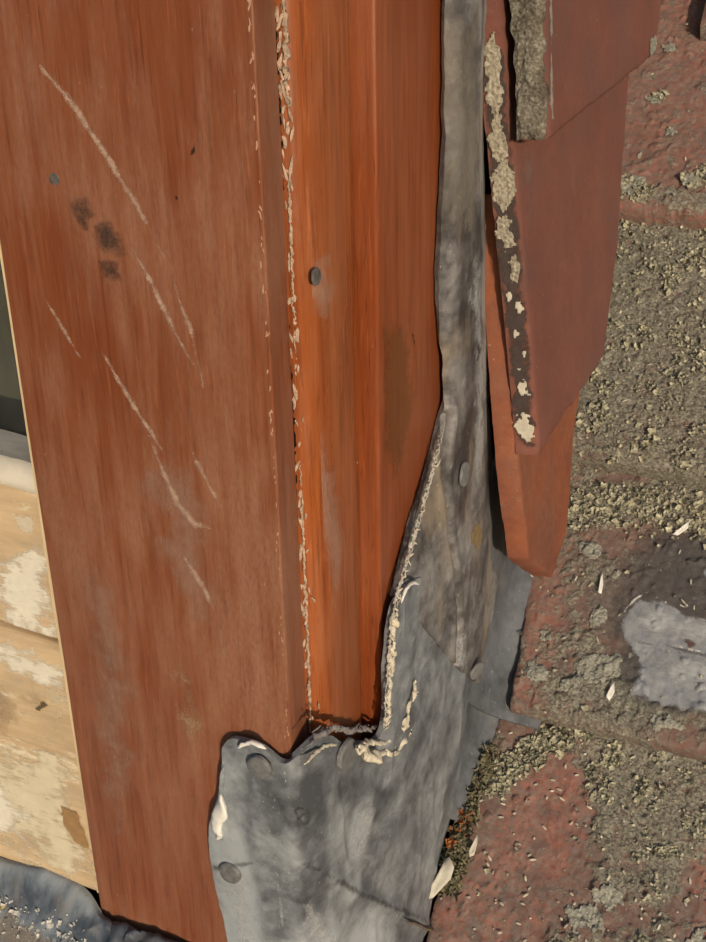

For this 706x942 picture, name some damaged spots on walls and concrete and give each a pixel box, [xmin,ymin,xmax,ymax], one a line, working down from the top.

water stain [98,224,117,248]
peeling [0,549,58,639]
peeling [0,643,68,715]
peeling [0,747,89,876]